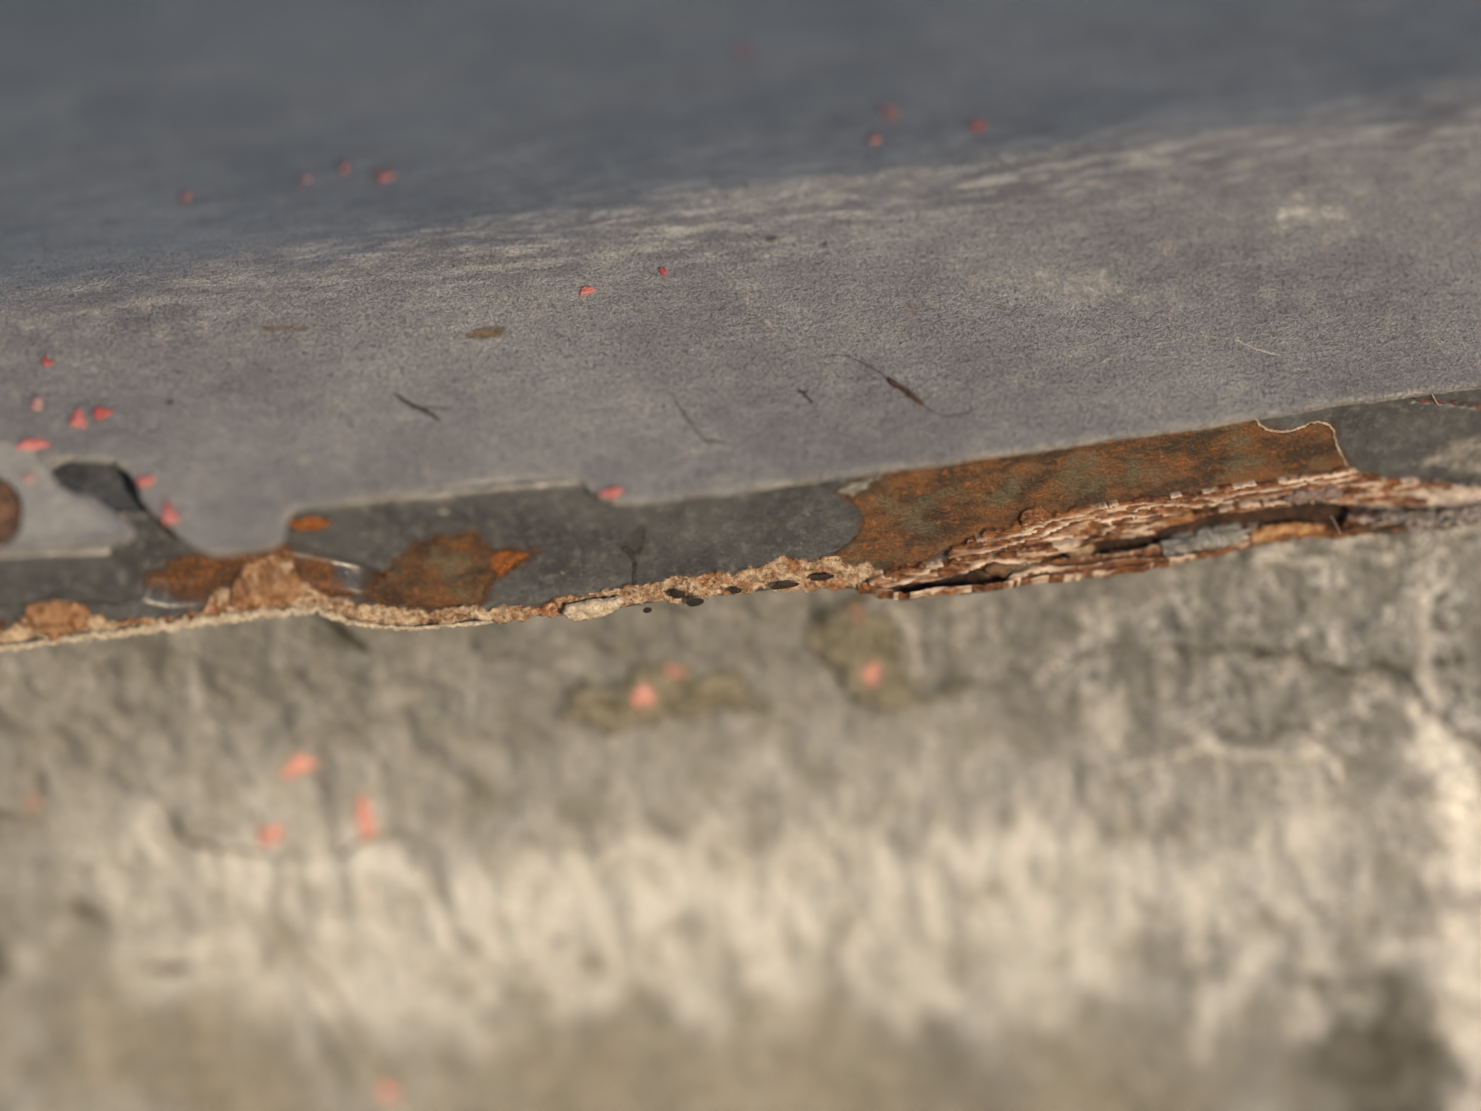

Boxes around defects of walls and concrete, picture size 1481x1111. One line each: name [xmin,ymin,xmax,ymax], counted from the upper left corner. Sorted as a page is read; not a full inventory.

corrosion [0,419,1454,651]
crack [1061,644,1481,742]